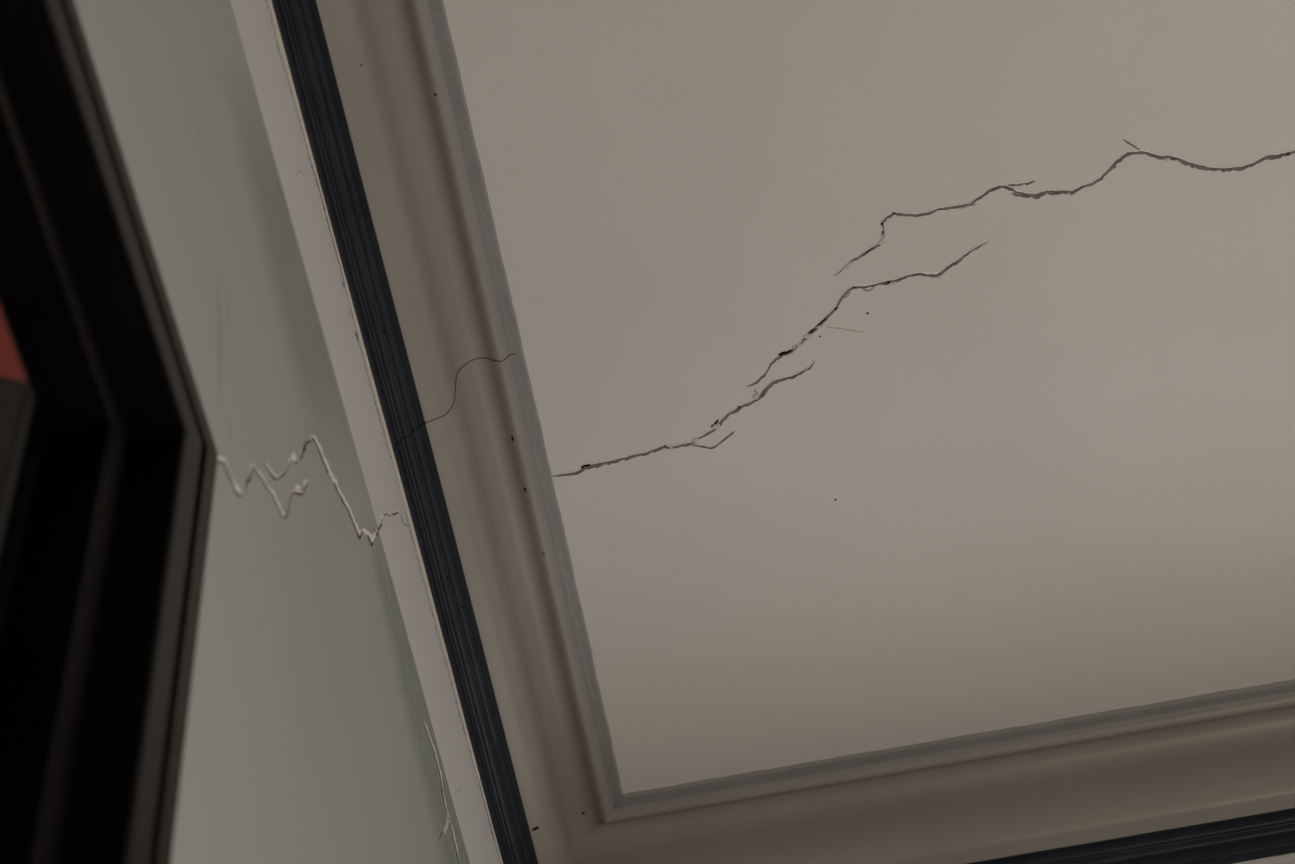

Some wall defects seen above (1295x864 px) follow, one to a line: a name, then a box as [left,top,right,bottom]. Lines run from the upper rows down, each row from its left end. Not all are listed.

crack [552,139,1295,477]
crack [217,435,494,864]